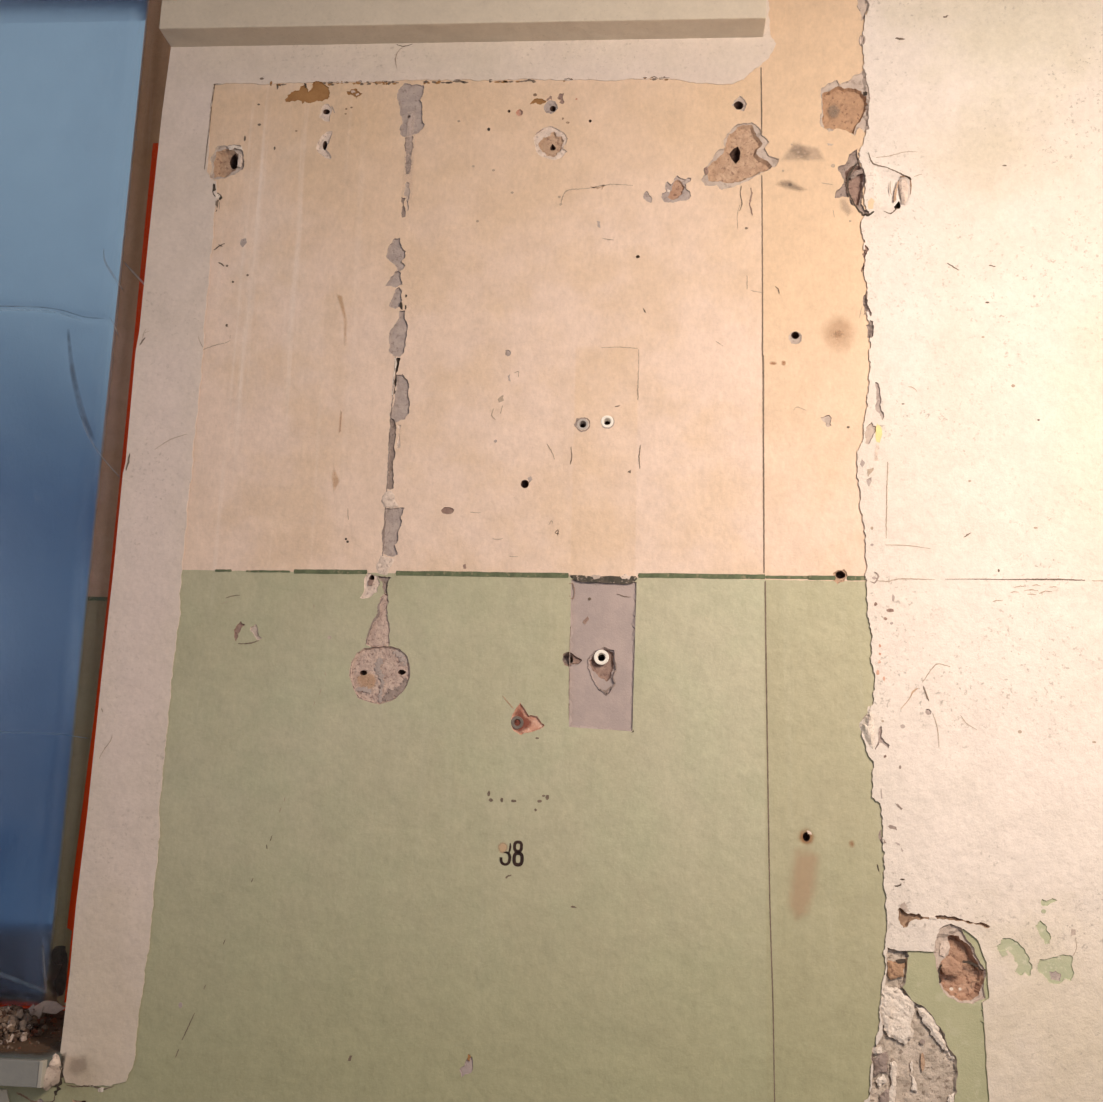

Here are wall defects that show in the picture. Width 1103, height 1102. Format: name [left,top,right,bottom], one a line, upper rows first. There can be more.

peeling [260,77,399,114]
peeling [489,78,577,116]
flaking render [820,69,870,136]
flaking render [533,118,569,160]
flaking render [643,122,779,203]
flaking render [835,149,874,216]
peeling [1035,898,1057,944]
peeling [997,929,1077,984]
flaking render [869,924,989,1102]